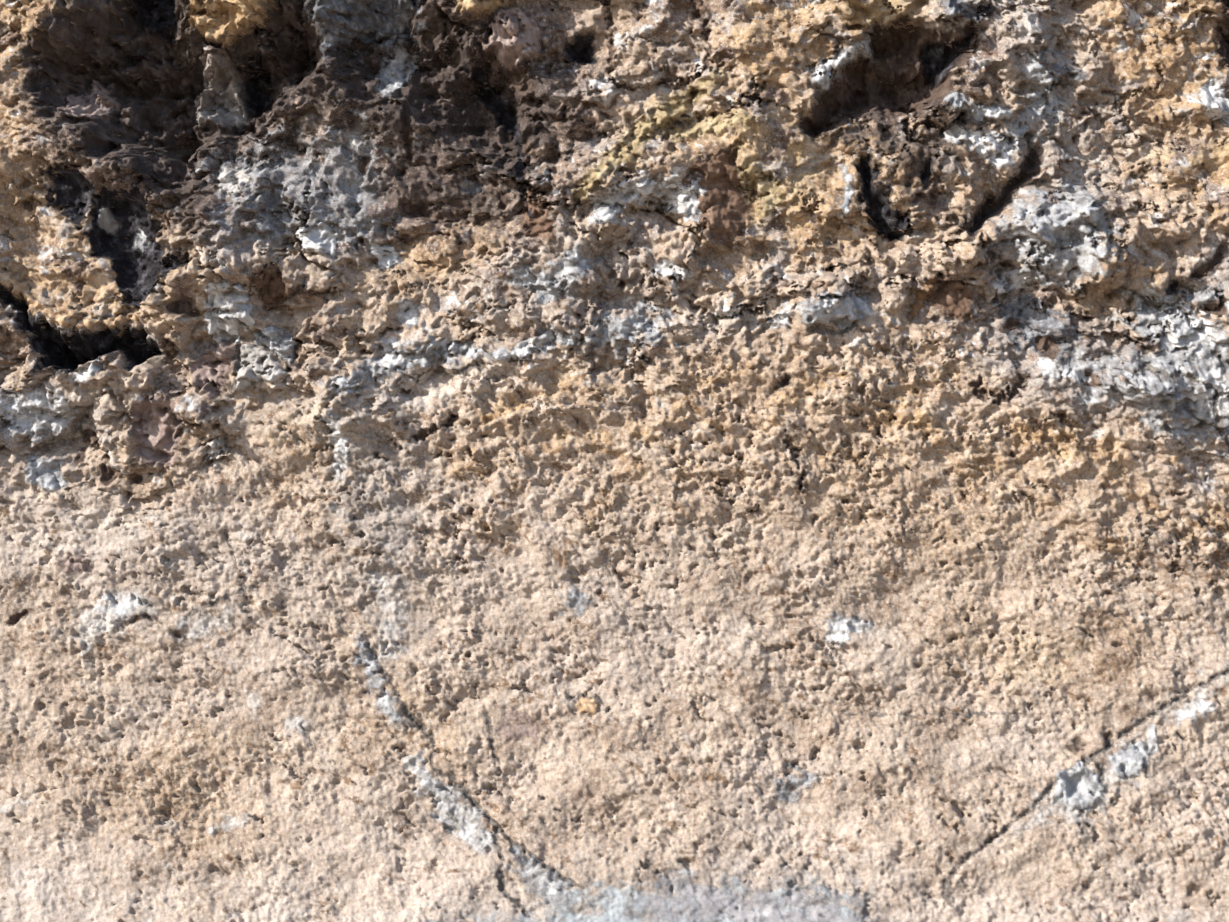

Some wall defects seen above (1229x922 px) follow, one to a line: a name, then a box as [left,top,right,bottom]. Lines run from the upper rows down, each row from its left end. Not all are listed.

leakage [908,182,1229,458]
leakage [403,751,494,853]
crack [366,644,584,917]
leakage [508,854,877,922]
crack [843,710,1027,718]
crack [942,669,1229,907]